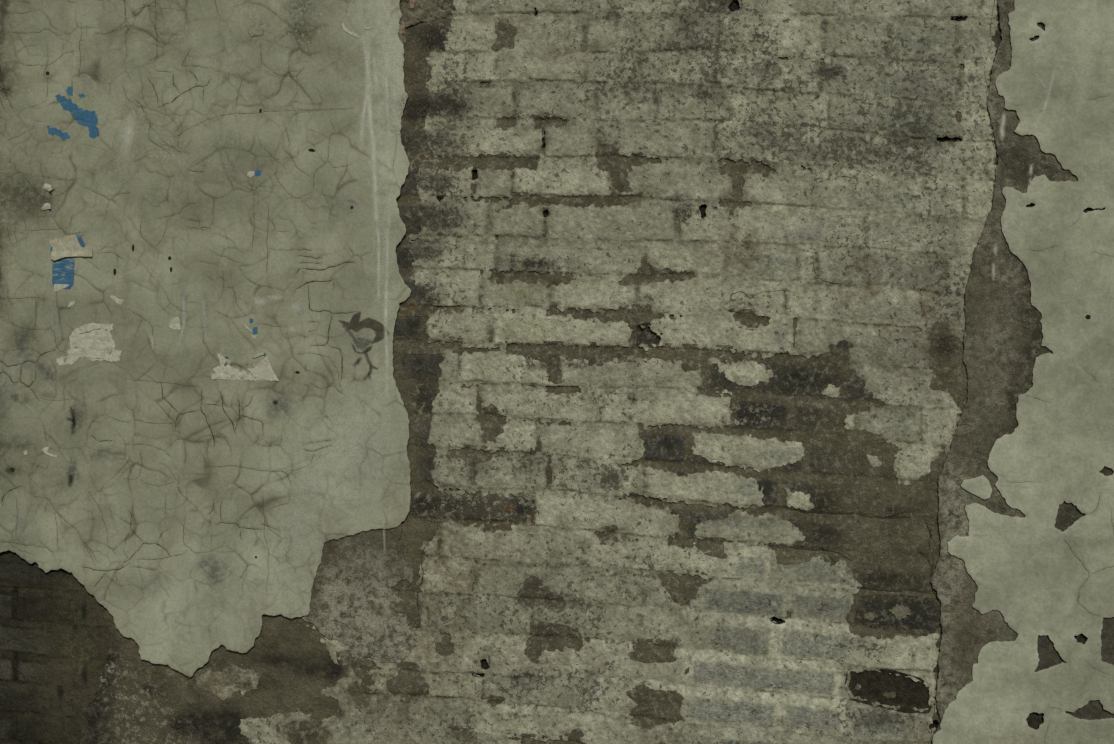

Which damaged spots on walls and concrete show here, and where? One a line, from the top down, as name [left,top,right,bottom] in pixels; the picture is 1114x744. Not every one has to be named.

crack [0,0,298,243]
crack [0,274,65,401]
crack [140,108,352,393]
peeling [282,0,1079,744]
crack [2,380,331,588]
peeling [1054,500,1086,532]
peeling [0,550,348,744]
peeling [1066,700,1114,720]
peeling [1074,617,1114,666]